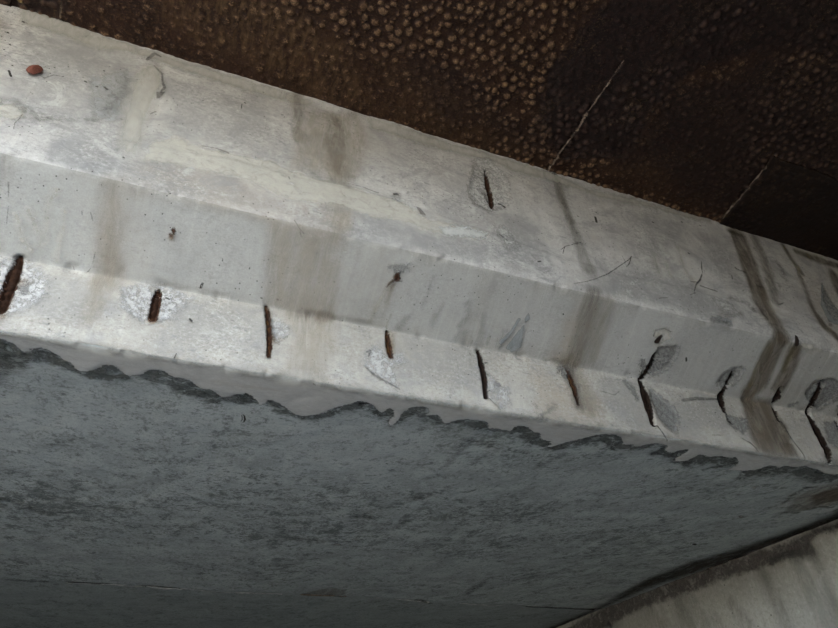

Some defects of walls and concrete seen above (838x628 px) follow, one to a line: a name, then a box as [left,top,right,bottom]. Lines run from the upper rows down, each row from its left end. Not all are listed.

corrosion [468,159,510,211]
corrosion [0,256,48,316]
corrosion [121,284,193,323]
corrosion [264,306,289,358]
corrosion [365,330,405,390]
peeling [0,333,838,475]
corrosion [476,349,509,409]
corrosion [558,366,579,406]
corrosion [622,328,749,441]
corrosion [771,388,805,458]
corrosion [788,378,838,464]
peeling [821,285,838,326]